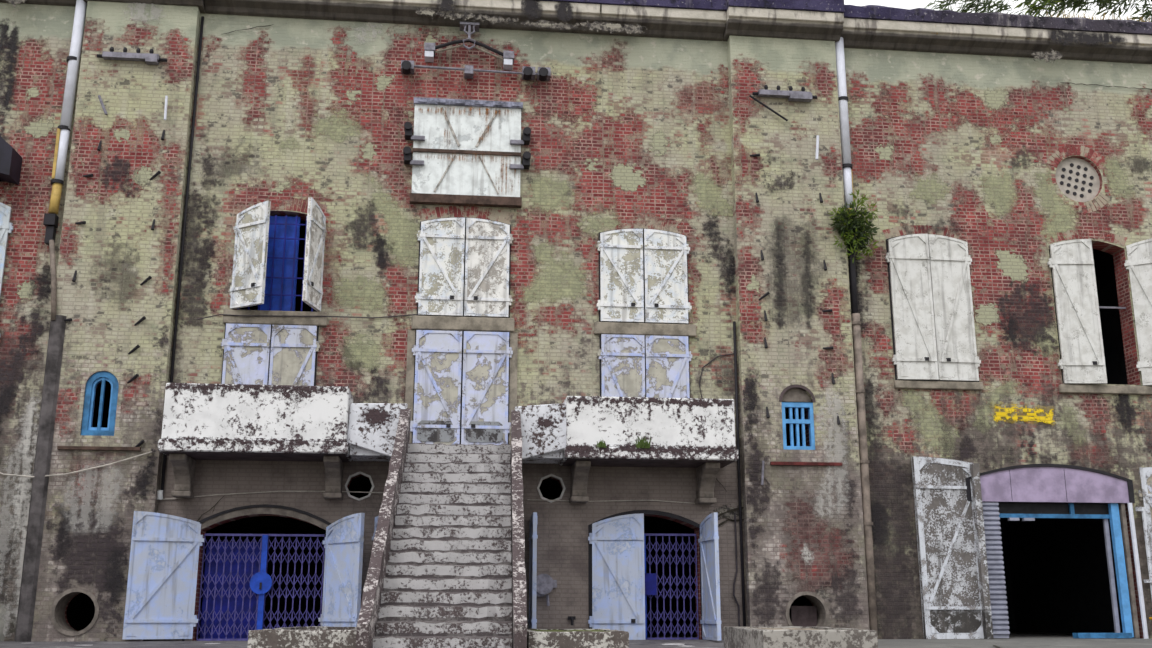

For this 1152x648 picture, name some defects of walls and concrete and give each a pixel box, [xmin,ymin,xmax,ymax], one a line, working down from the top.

leakage [0,21,19,138]
peeling [0,38,82,385]
peeling [70,117,185,295]
leakage [158,135,219,351]
peeling [229,178,343,307]
peeling [293,8,769,353]
peeling [802,61,1146,243]
peeling [930,179,1120,469]
leakage [0,265,51,634]
leakage [46,493,129,641]
leakage [123,369,389,506]
leakage [819,369,919,639]